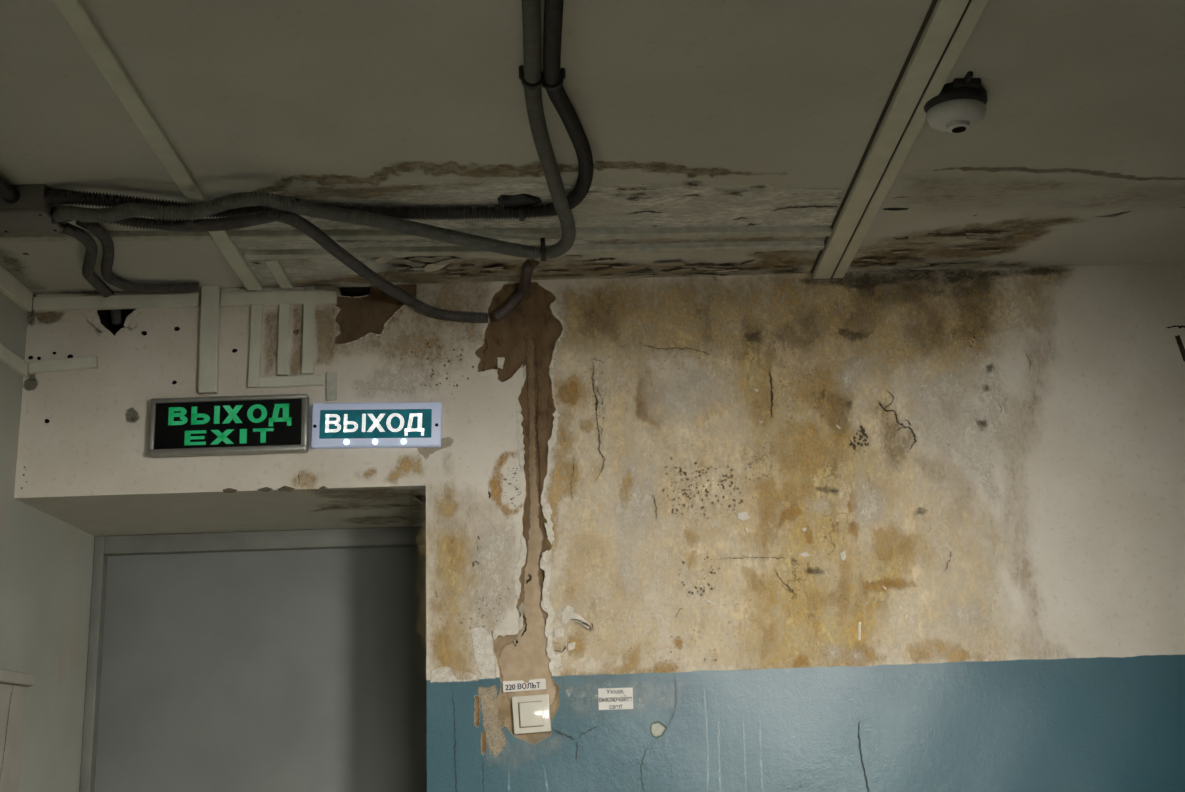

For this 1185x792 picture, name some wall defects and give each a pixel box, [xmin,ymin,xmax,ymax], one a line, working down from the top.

water stain [943,167,1183,190]
flaking render [84,308,144,336]
flaking render [334,256,464,345]
water stain [246,161,1069,683]
flaking render [474,282,584,761]
crack [858,718,869,792]